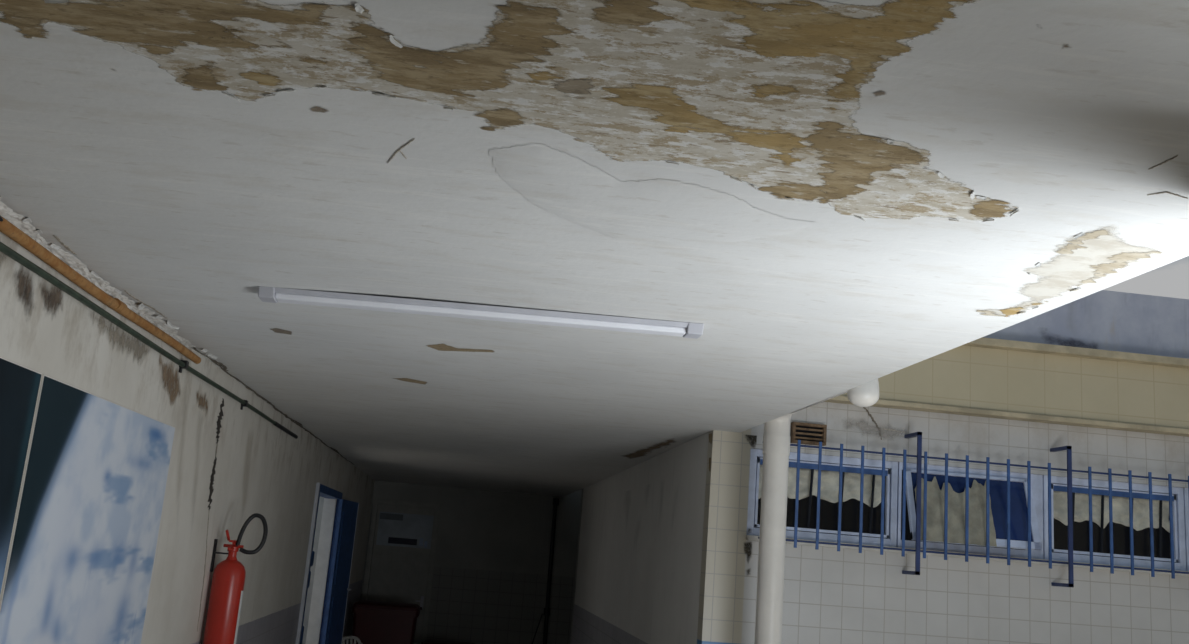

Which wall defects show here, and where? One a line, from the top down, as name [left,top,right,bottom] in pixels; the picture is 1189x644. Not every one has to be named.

peeling [0,0,1019,222]
water stain [17,269,63,313]
flaking render [0,196,217,359]
peeling [976,227,1162,317]
water stain [159,359,180,402]
peeling [427,344,494,352]
crack [194,348,353,632]